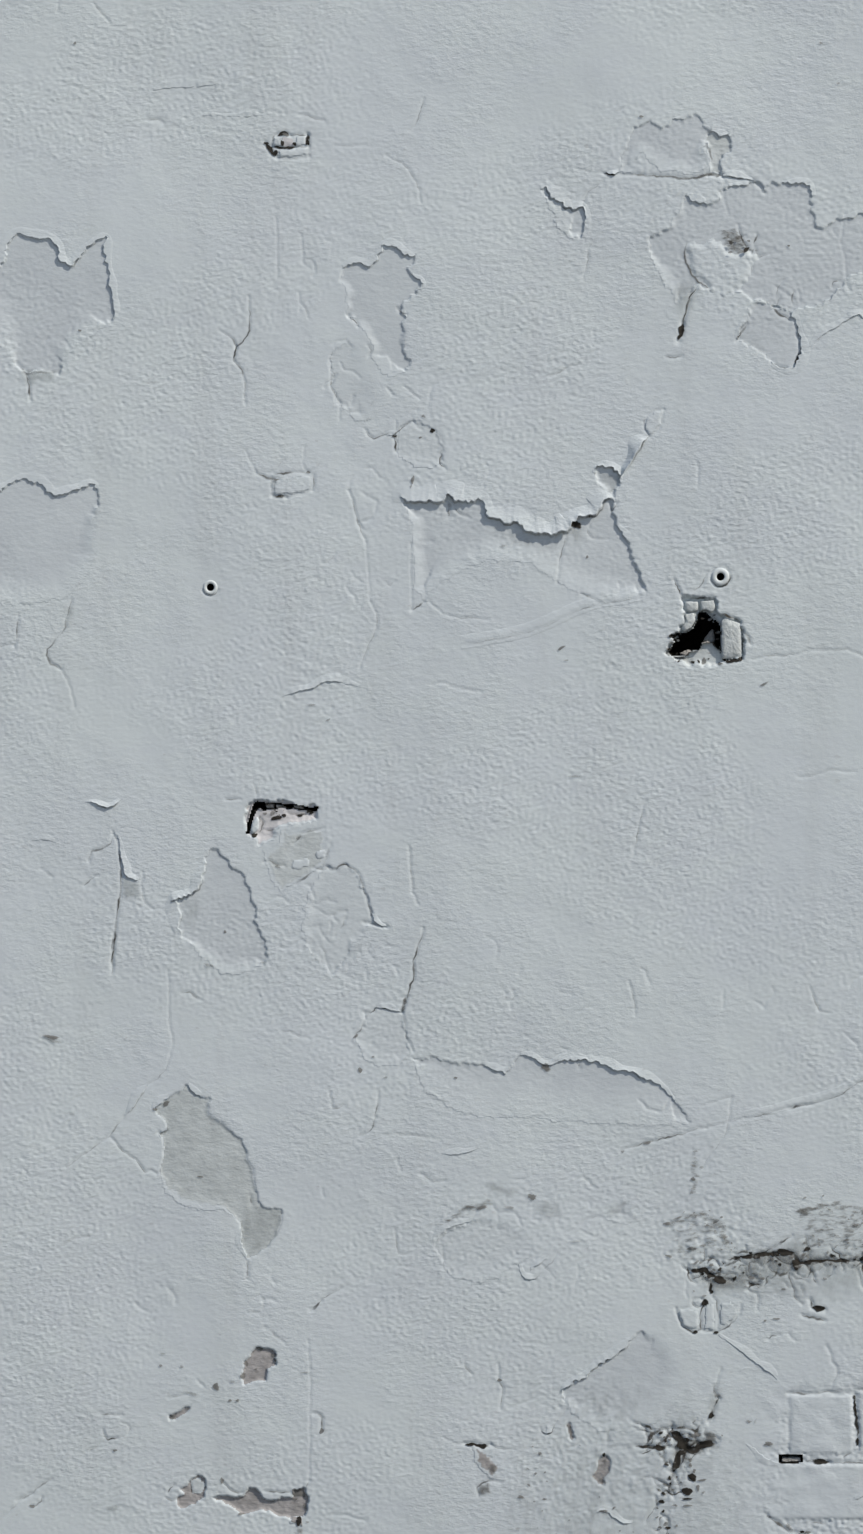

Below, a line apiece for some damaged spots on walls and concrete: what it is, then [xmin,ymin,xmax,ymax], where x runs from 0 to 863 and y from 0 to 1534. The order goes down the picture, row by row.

peeling [0,227,120,394]
peeling [340,238,426,377]
peeling [540,183,592,240]
peeling [649,128,863,375]
peeling [0,472,99,607]
peeling [390,434,648,601]
spalling [667,583,745,666]
spalling [246,801,319,834]
peeling [165,848,267,976]
peeling [413,1051,690,1127]
flaking render [151,1083,283,1259]
spalling [169,1475,308,1532]